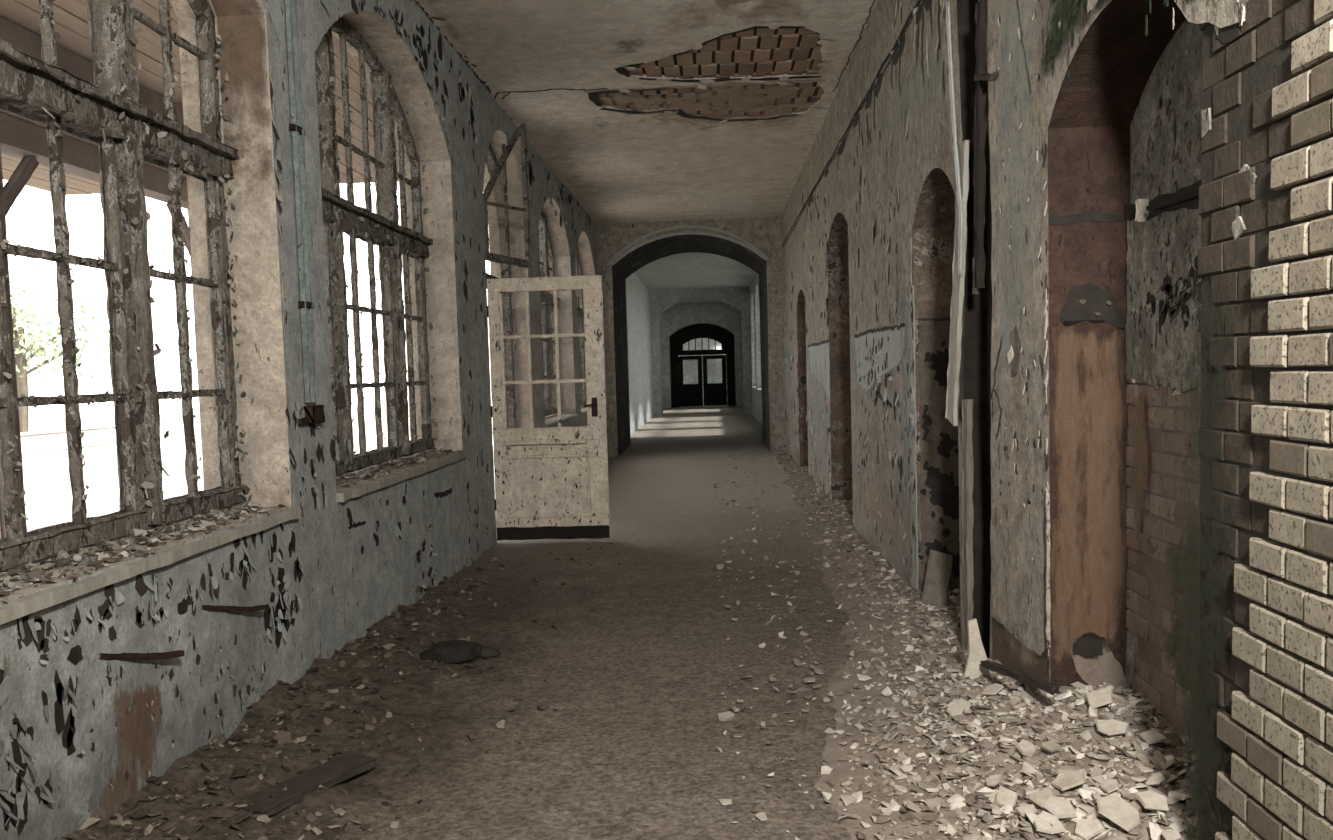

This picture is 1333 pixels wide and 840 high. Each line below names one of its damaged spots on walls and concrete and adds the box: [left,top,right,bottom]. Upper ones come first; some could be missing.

peeling [0,27,438,837]
spalling [588,9,831,123]
spalling [853,102,960,591]
spalling [1125,0,1333,840]